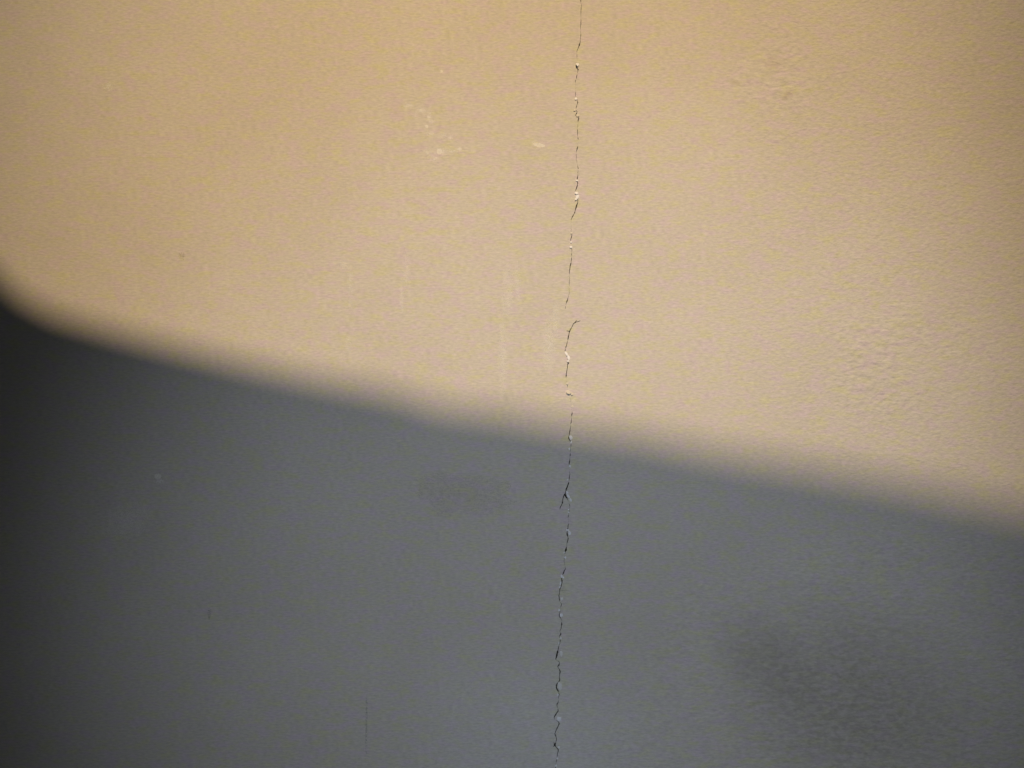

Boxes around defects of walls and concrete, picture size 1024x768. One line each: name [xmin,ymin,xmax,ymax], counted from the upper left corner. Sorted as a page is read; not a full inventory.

crack [553,0,582,768]